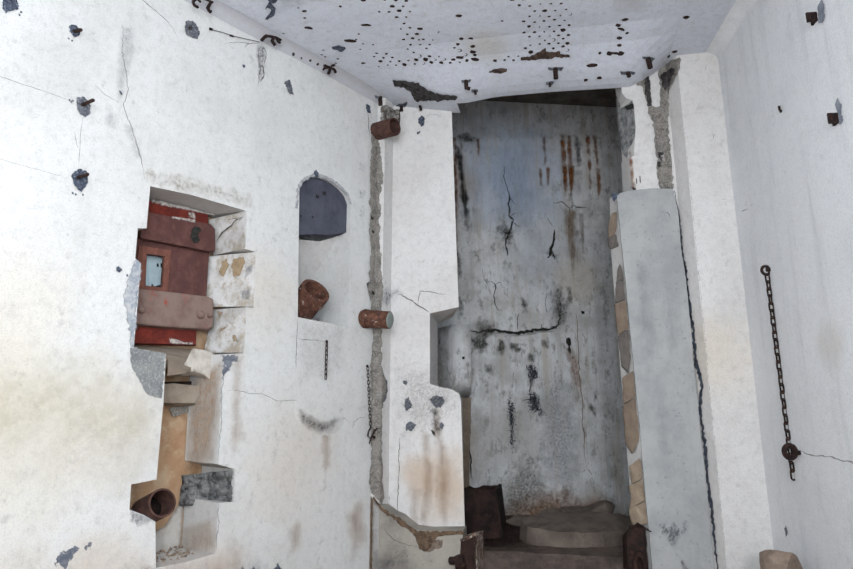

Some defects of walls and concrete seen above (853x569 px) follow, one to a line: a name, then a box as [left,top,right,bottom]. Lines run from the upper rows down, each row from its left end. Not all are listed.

spalling [393,80,457,102]
spalling [636,57,681,189]
spalling [367,134,384,311]
crack [501,167,520,255]
crack [547,201,586,259]
spalling [116,260,166,398]
spalling [369,328,464,552]
water stain [471,326,493,352]
water stain [507,398,516,448]
crack [471,293,591,473]
water stain [526,355,545,416]
crack [666,191,718,569]